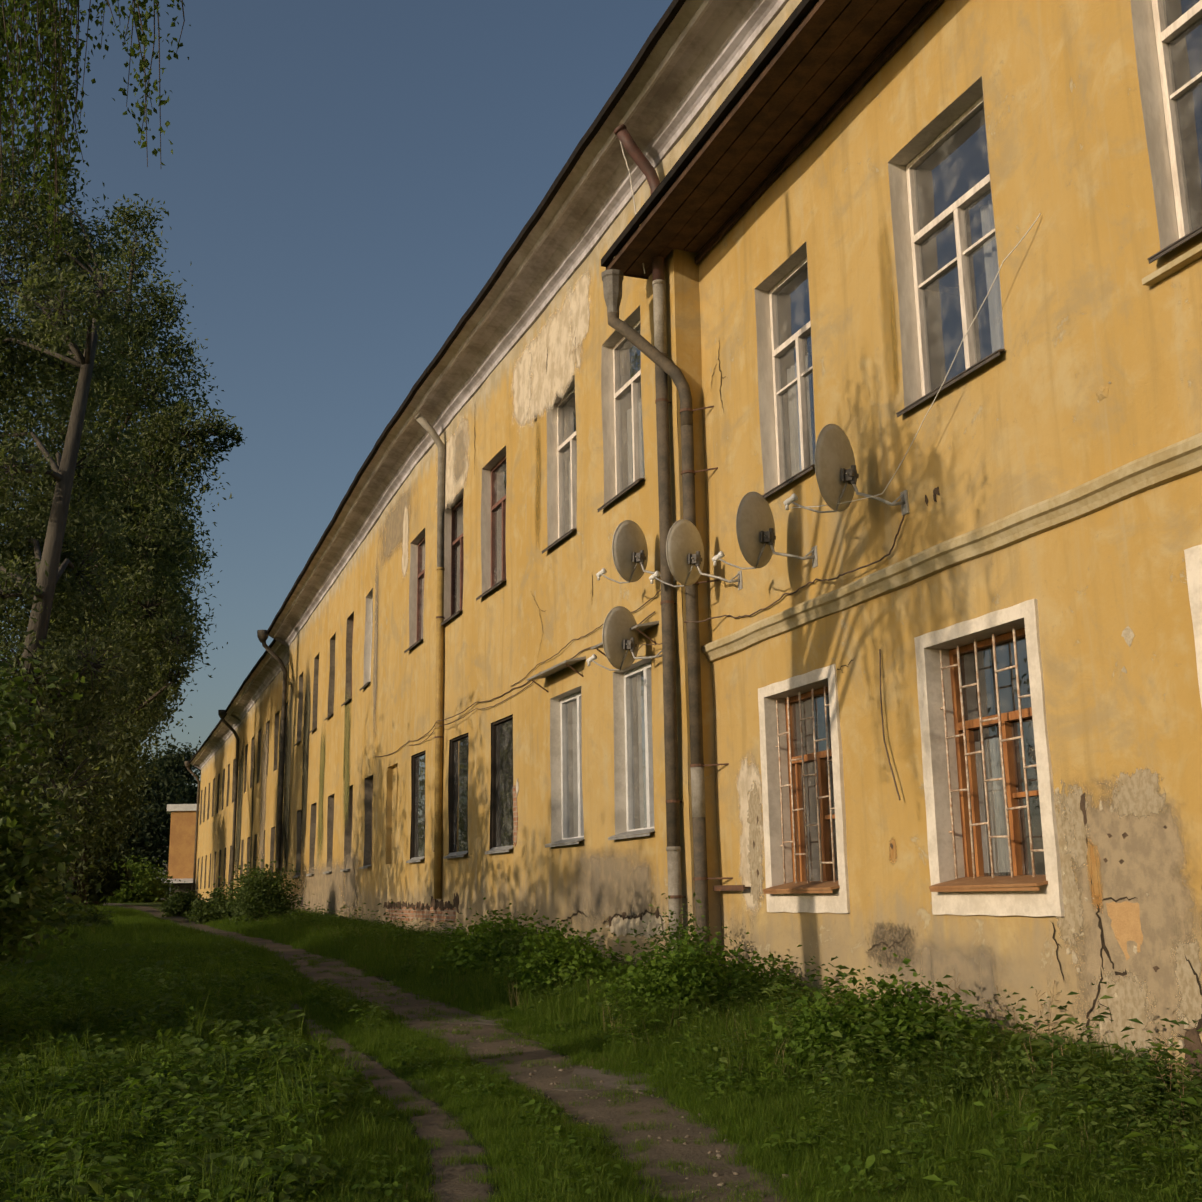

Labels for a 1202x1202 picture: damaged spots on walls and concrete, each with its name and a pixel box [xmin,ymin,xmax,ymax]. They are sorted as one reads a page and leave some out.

spalling [383,892,459,923]
spalling [603,908,666,938]
water stain [868,923,995,1019]
crack [1052,923,1064,981]
crack [1086,837,1127,1050]
flaking render [1054,768,1202,1060]
crack [1184,956,1202,1034]